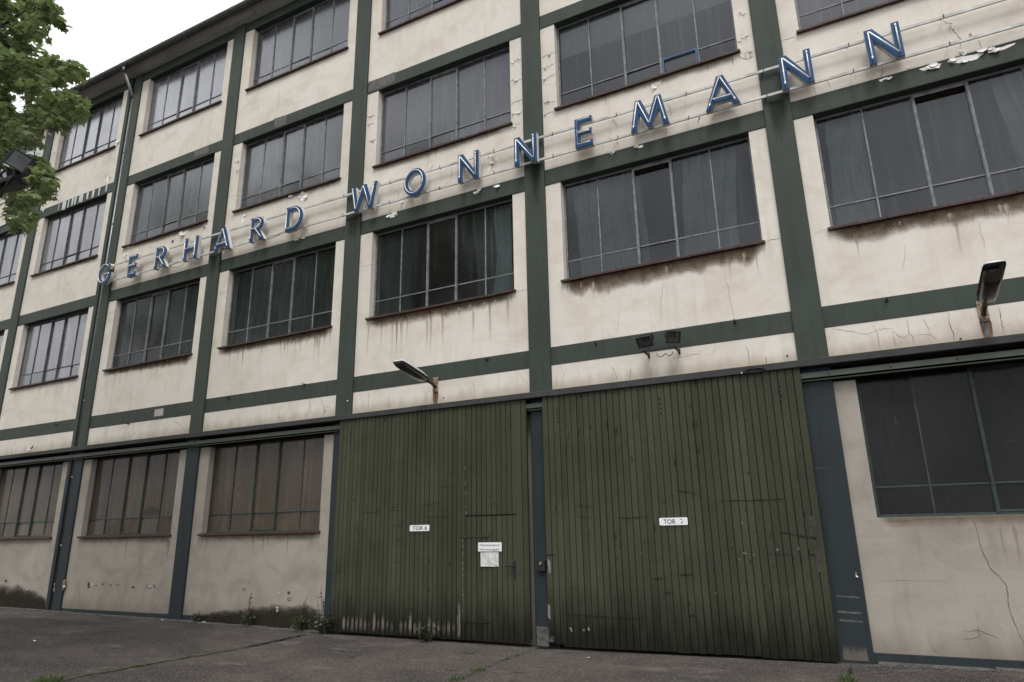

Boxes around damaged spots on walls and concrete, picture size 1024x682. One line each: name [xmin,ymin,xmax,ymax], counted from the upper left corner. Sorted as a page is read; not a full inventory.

peeling [906,33,1015,71]
damp [837,193,1024,241]
damp [569,245,757,293]
damp [373,293,510,325]
crack [838,322,955,347]
damp [0,586,45,610]
crack [963,516,1024,644]
damp [194,606,320,631]